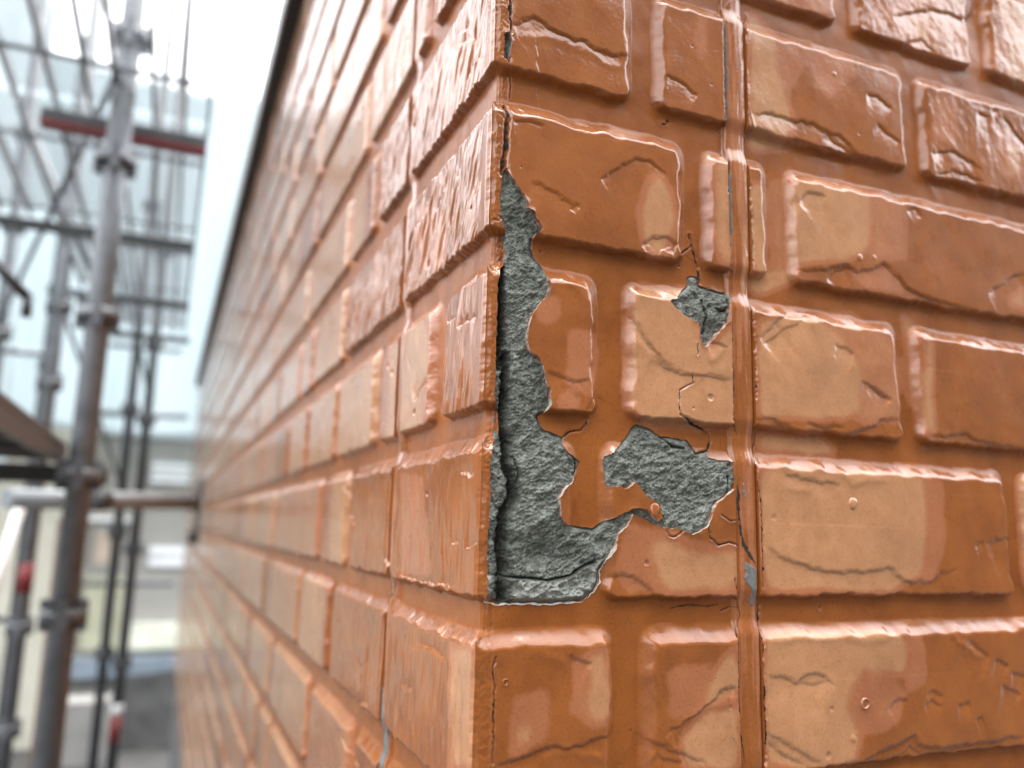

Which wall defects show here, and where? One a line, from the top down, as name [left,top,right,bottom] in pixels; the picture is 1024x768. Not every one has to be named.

crack [681,237,700,282]
spalling [483,170,747,606]
crack [679,345,710,454]